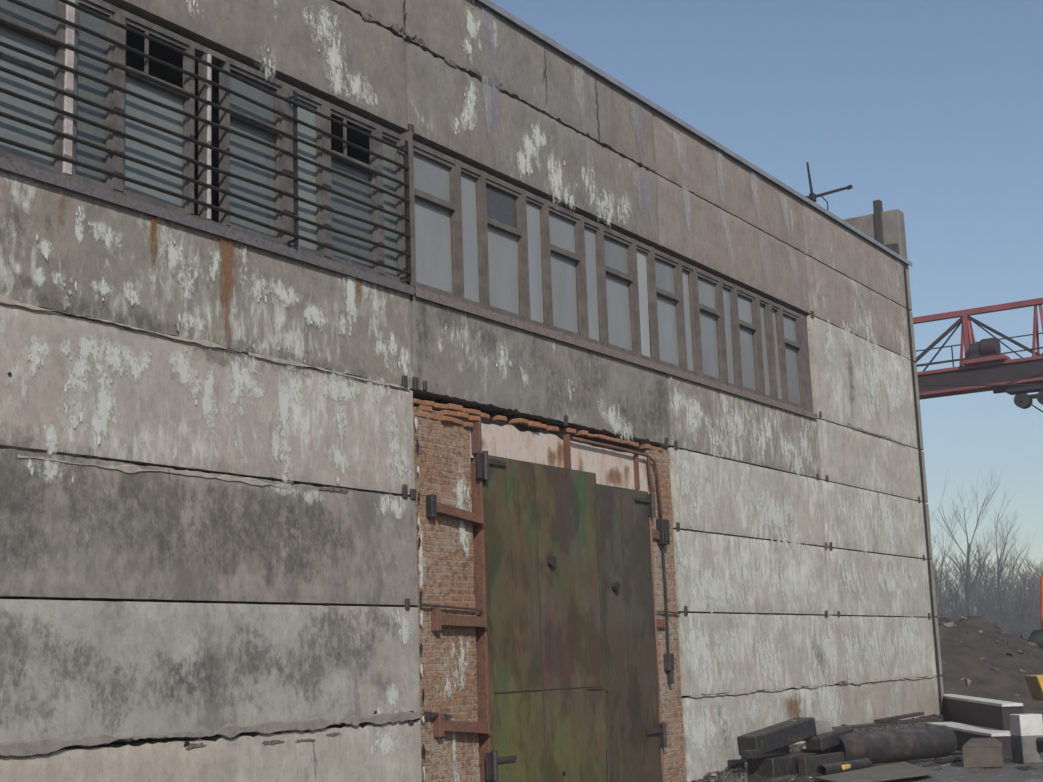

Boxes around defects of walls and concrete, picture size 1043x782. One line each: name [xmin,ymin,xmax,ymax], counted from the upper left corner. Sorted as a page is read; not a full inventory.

peeling [304,9,377,103]
crack [397,1,427,48]
peeling [442,0,503,134]
peeling [517,124,630,224]
rust [218,236,237,341]
peeling [240,248,325,331]
peeling [25,425,74,483]
peeling [28,336,151,446]
peeling [272,333,410,506]
spalling [389,398,663,482]
rust [607,466,629,484]
peeling [670,377,812,476]